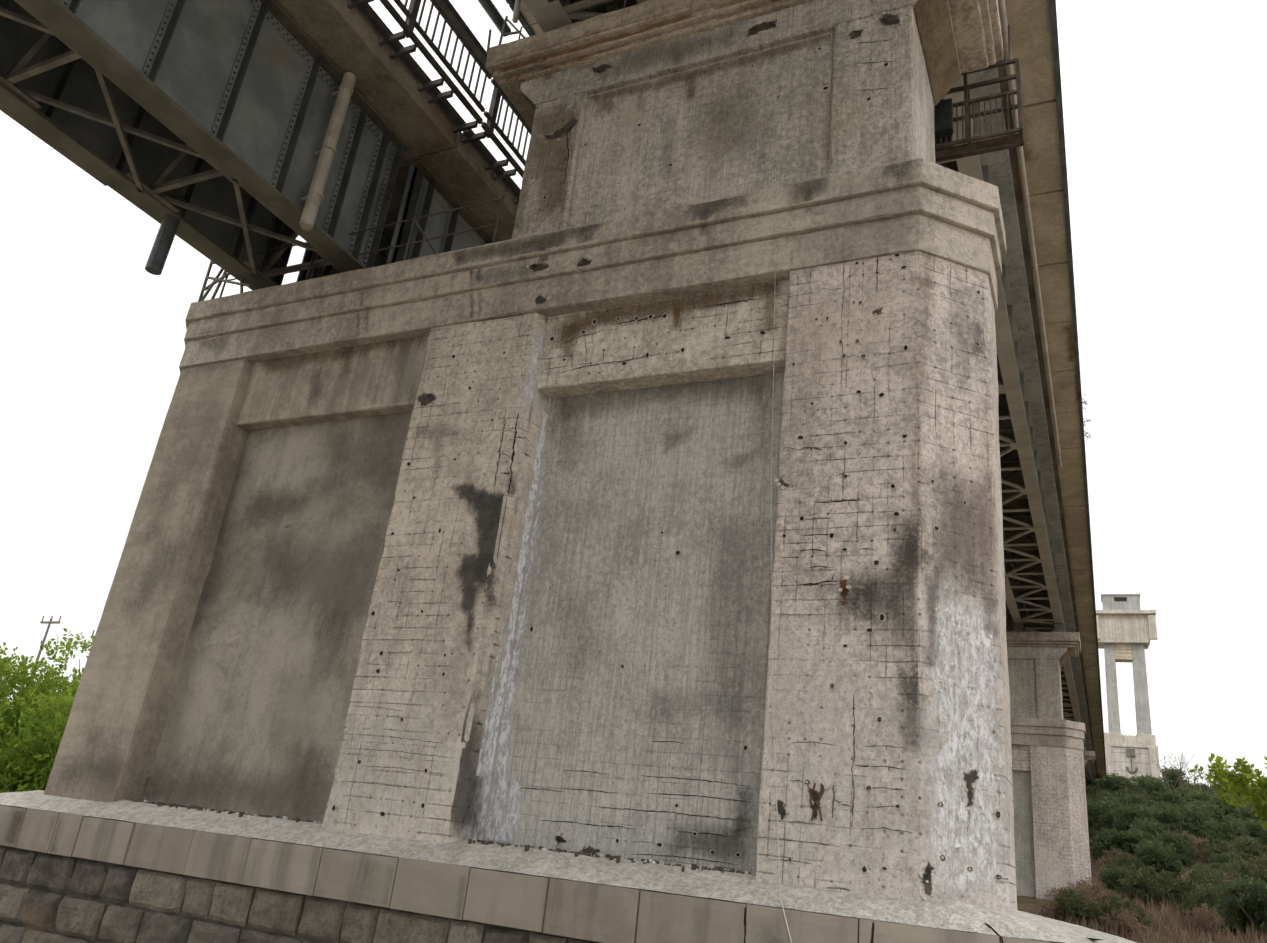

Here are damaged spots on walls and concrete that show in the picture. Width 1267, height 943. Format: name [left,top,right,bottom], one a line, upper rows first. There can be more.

damp [451,283,775,842]
damp [846,525,923,637]
damp [930,476,990,623]
damp [902,658,918,744]
crack [522,695,978,865]
crack [741,908,749,943]
crack [868,922,876,943]